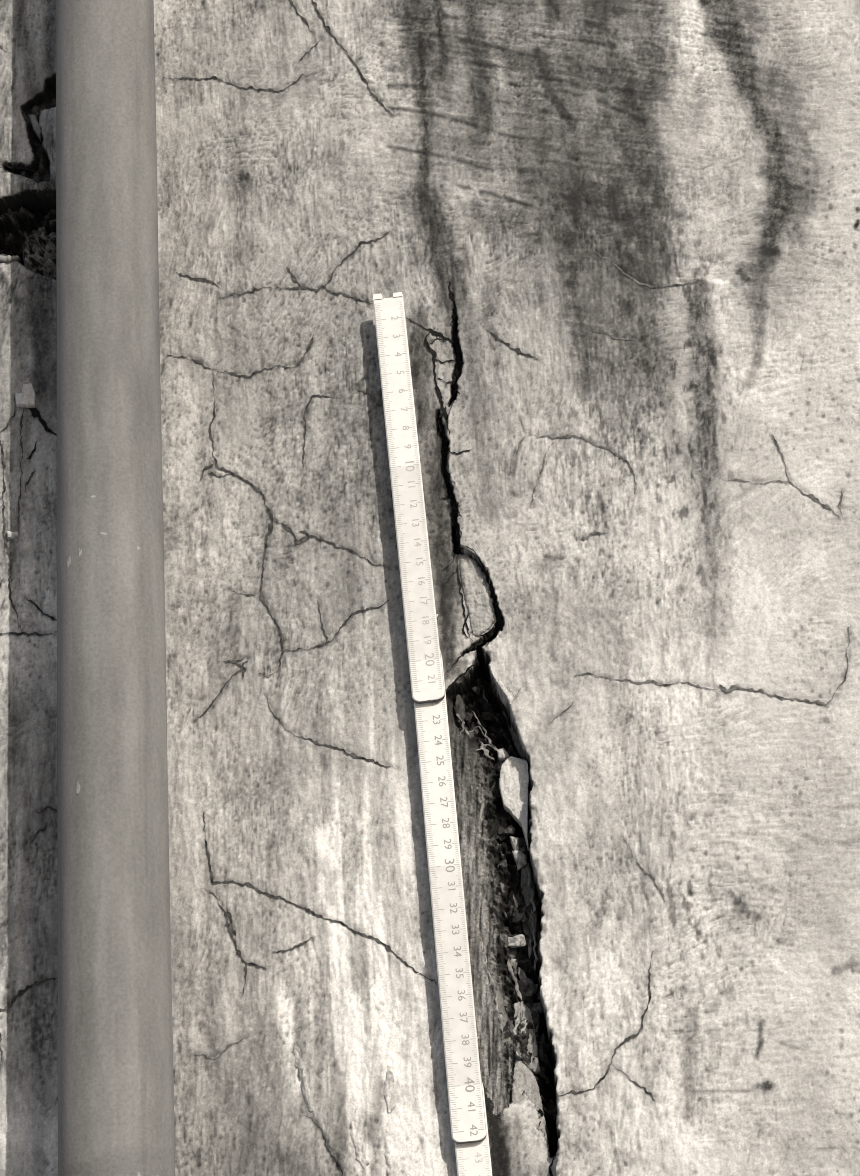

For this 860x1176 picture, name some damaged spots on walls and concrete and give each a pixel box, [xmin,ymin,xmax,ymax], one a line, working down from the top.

peeling [0,254,21,263]
spalling [9,89,56,182]
damp [401,0,471,310]
damp [701,0,817,281]
crack [167,334,396,769]
damp [431,438,461,677]
crack [406,281,504,690]
crack [550,627,850,723]
damp [689,279,722,485]
crack [203,812,436,994]
spalling [446,557,558,1158]
crack [556,951,655,1101]